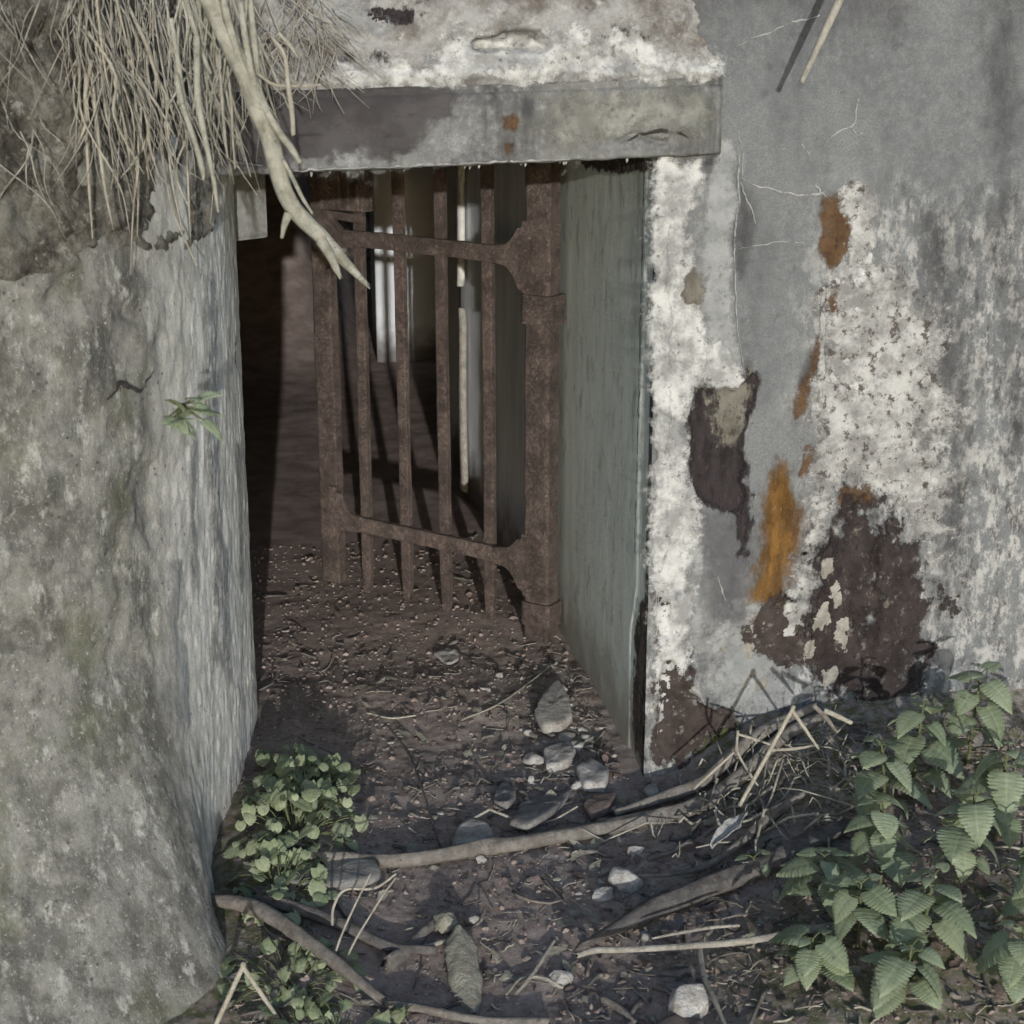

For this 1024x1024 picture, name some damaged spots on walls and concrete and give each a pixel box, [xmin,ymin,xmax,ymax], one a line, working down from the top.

damp [220,93,267,170]
damp [332,1,393,37]
damp [264,8,725,173]
crack [628,128,689,141]
crack [738,99,862,249]
rust [819,181,855,269]
spalling [683,362,762,515]
rust [793,335,825,419]
damp [644,139,978,743]
rust [746,445,815,622]
spalling [741,482,962,702]
spalling [632,591,740,770]